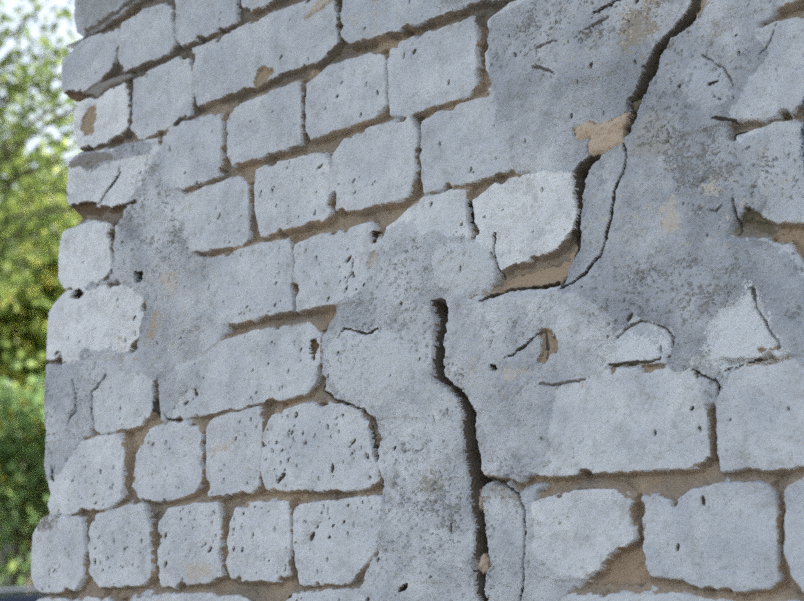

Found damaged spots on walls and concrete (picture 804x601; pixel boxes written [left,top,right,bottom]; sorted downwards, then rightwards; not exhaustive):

peeling [64,73,138,136]
spalling [253,65,274,89]
crack [478,0,701,301]
crack [98,171,121,205]
crack [505,330,550,359]
crack [608,319,675,367]
crack [692,286,781,395]
crack [431,298,527,601]